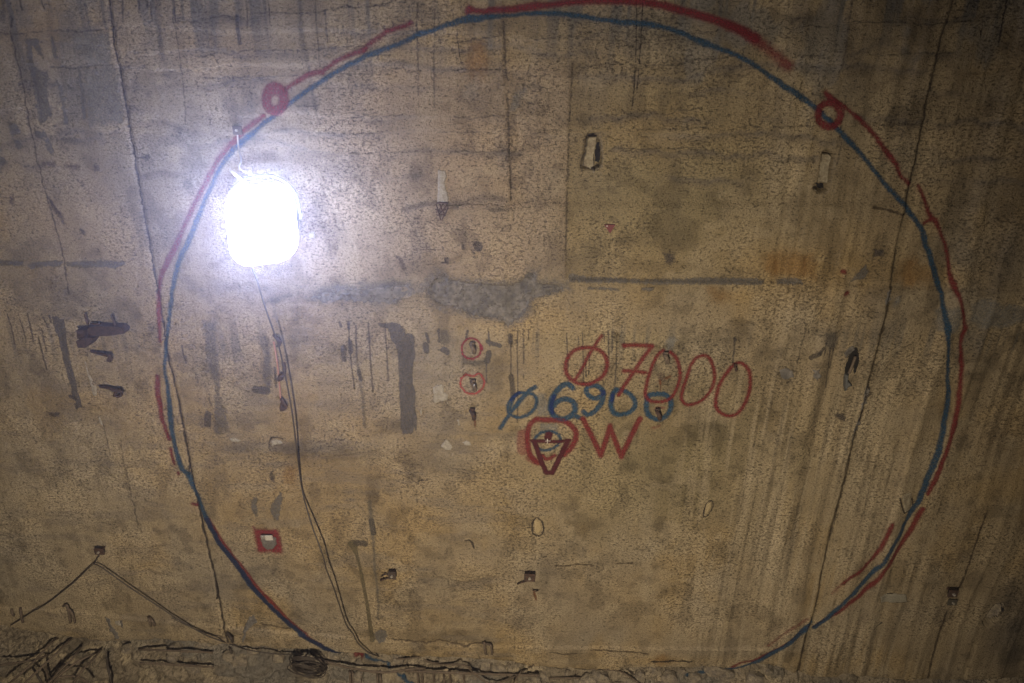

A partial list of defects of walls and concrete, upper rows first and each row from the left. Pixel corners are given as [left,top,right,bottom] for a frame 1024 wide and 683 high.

crack [873,0,1007,216]
crack [76,0,229,643]
spalling [0,604,1024,683]
crack [797,257,895,671]
crack [927,613,947,679]
crack [958,510,988,590]